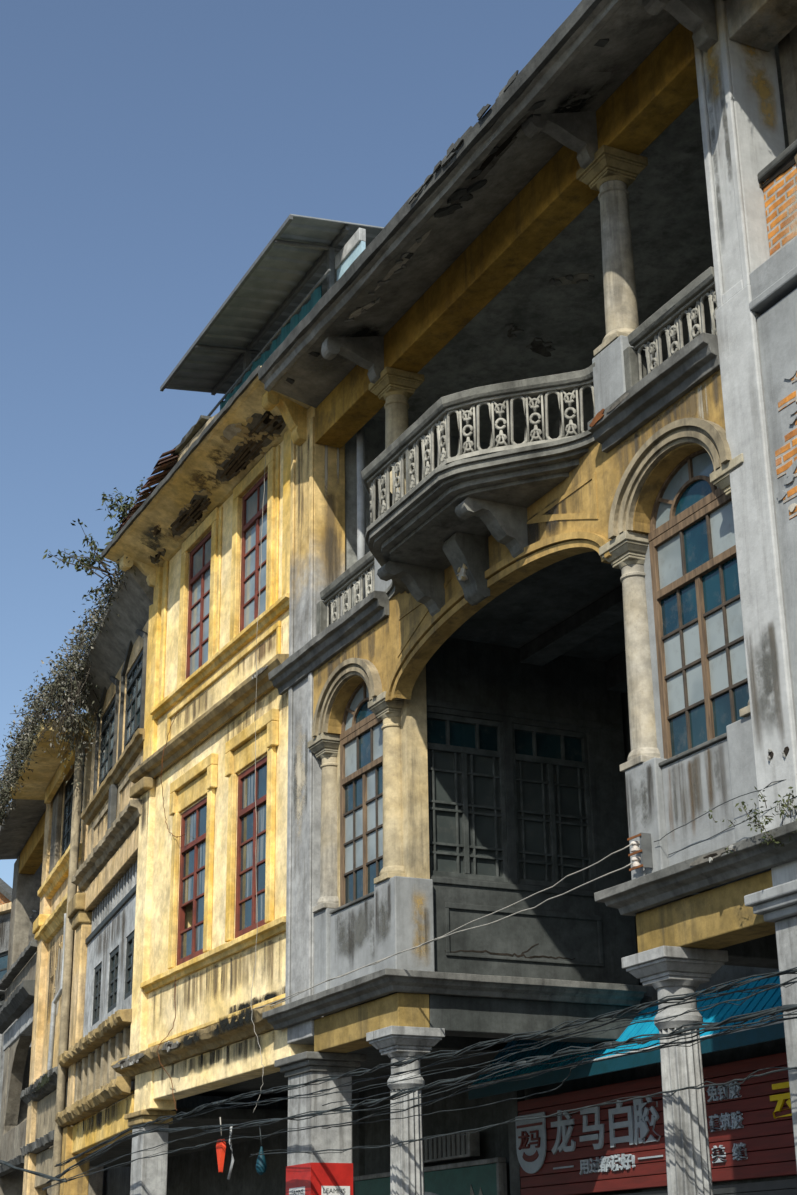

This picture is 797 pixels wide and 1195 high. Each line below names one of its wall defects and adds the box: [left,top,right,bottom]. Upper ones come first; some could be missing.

flaking render [220,415,281,460]
flaking render [775,370,797,519]
water stain [750,626,780,722]
water stain [339,885,390,953]
water stain [184,959,248,1003]
water stain [181,987,285,1070]